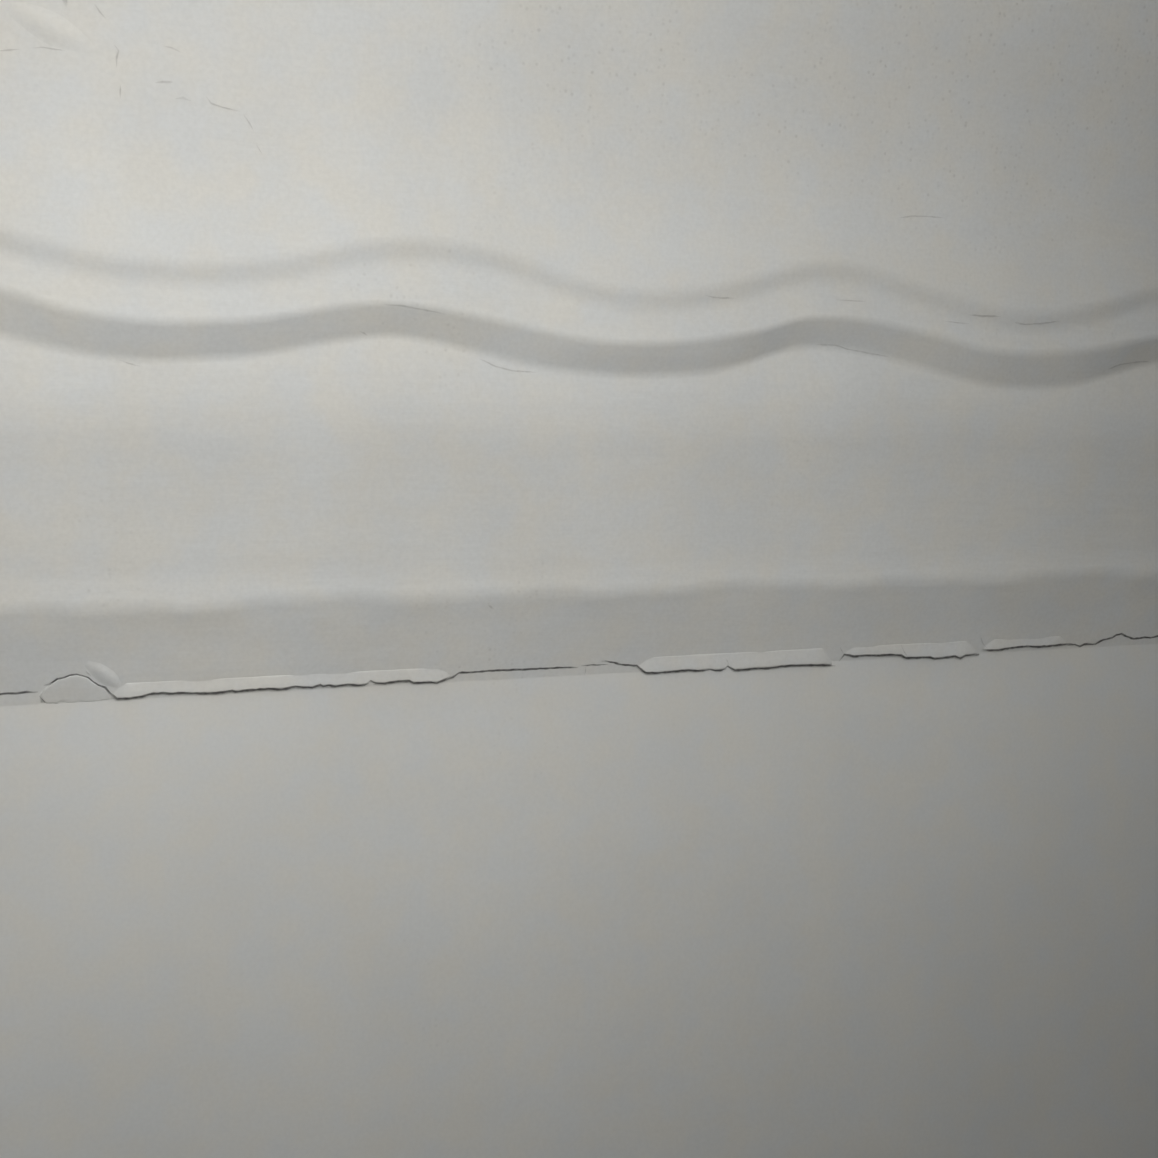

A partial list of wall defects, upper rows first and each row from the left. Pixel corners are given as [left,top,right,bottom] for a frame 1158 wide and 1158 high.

crack [0,633,1158,704]